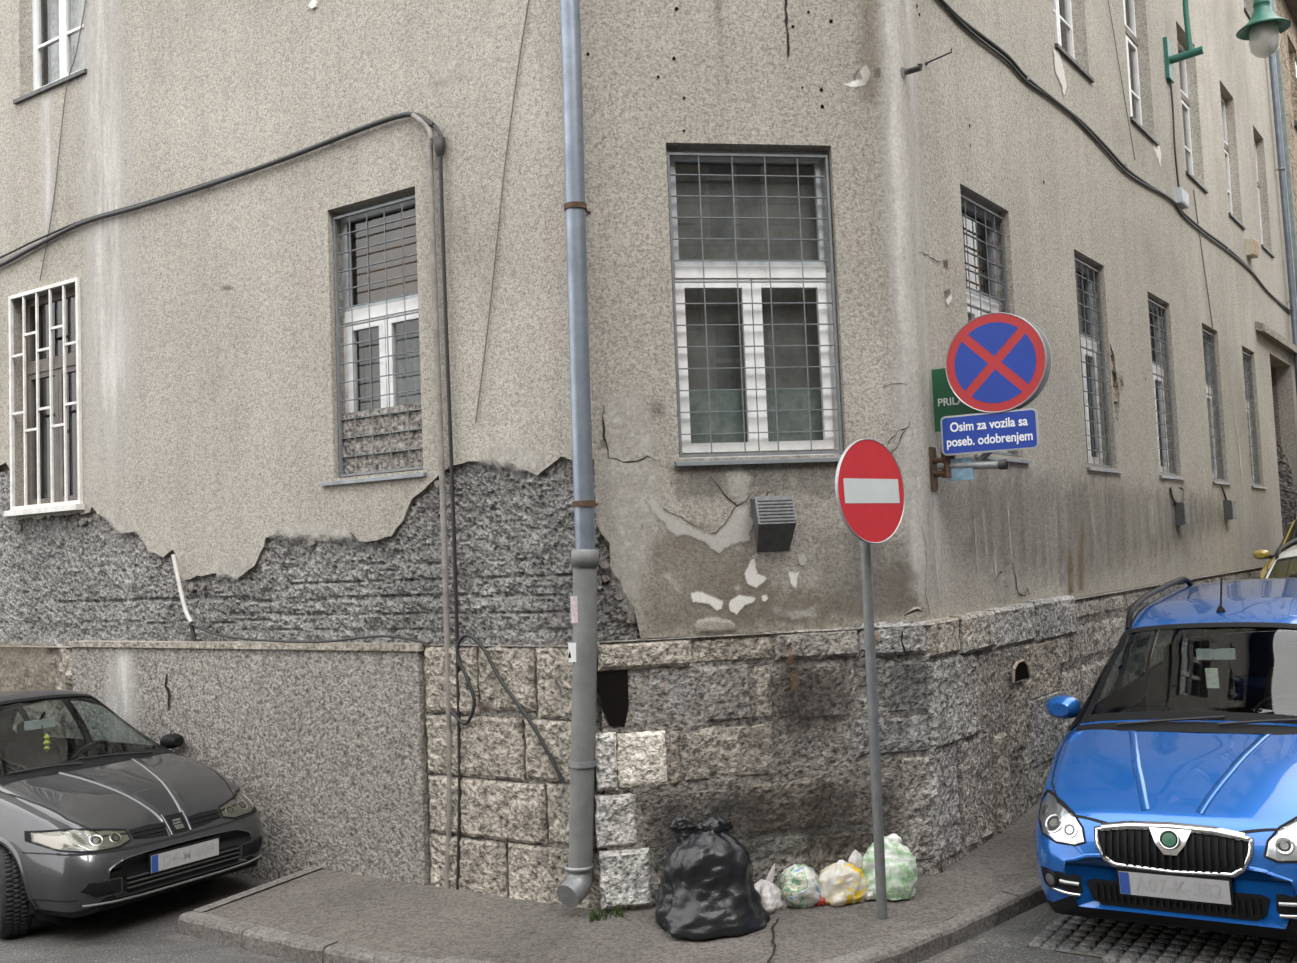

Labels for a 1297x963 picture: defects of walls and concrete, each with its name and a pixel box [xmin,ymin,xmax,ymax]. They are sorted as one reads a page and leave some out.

crack [783,0,791,57]
flaking render [342,403,423,478]
flaking render [0,457,575,646]
flaking render [593,459,668,642]
flaking render [645,473,753,553]
flaking render [664,553,816,619]